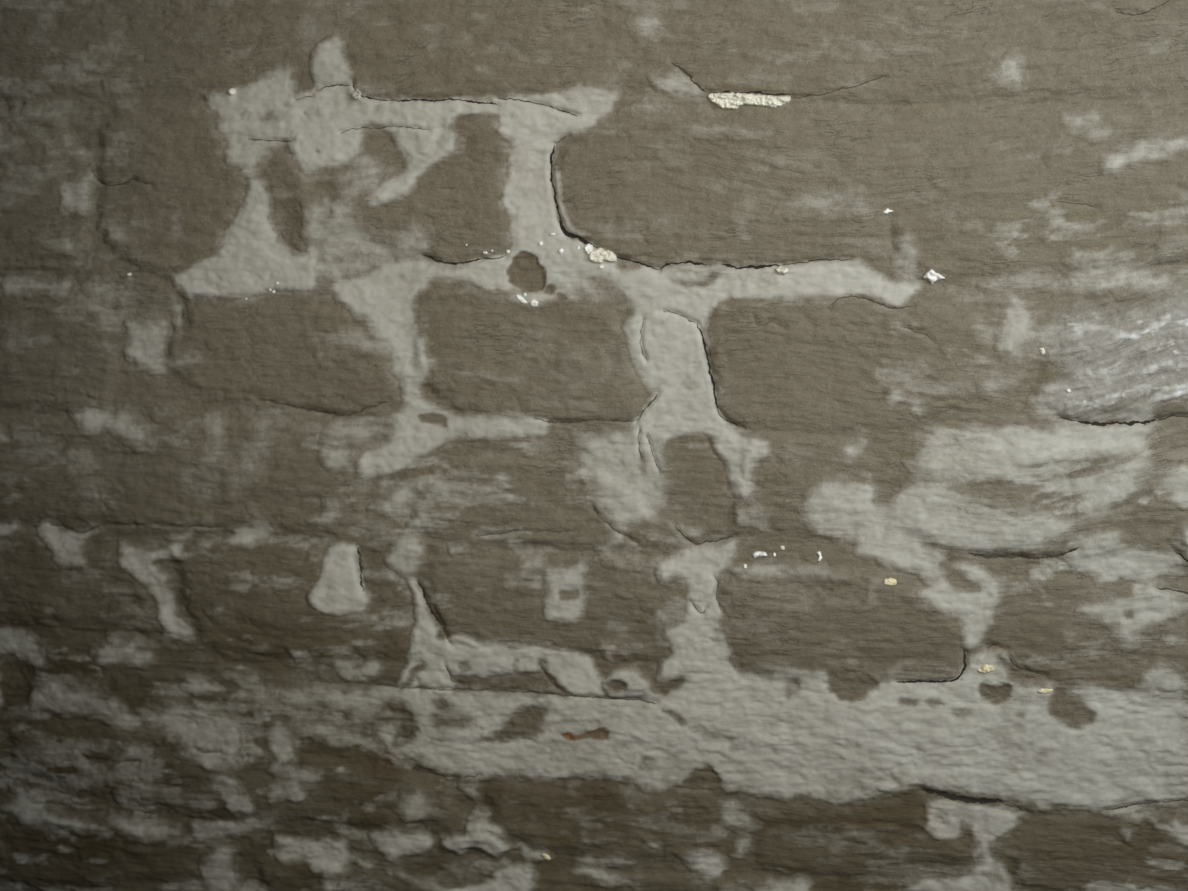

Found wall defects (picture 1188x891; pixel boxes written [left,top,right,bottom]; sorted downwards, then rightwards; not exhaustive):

peeling [708,92,791,110]
crack [671,62,883,99]
crack [296,81,850,270]
spalling [483,233,617,307]
crack [640,310,742,427]
crack [309,579,657,704]
spalling [824,664,880,703]
crack [895,644,1044,683]
spalling [978,664,1012,706]
spalling [477,702,549,743]
rust [562,726,611,741]
spalling [1037,684,1097,730]